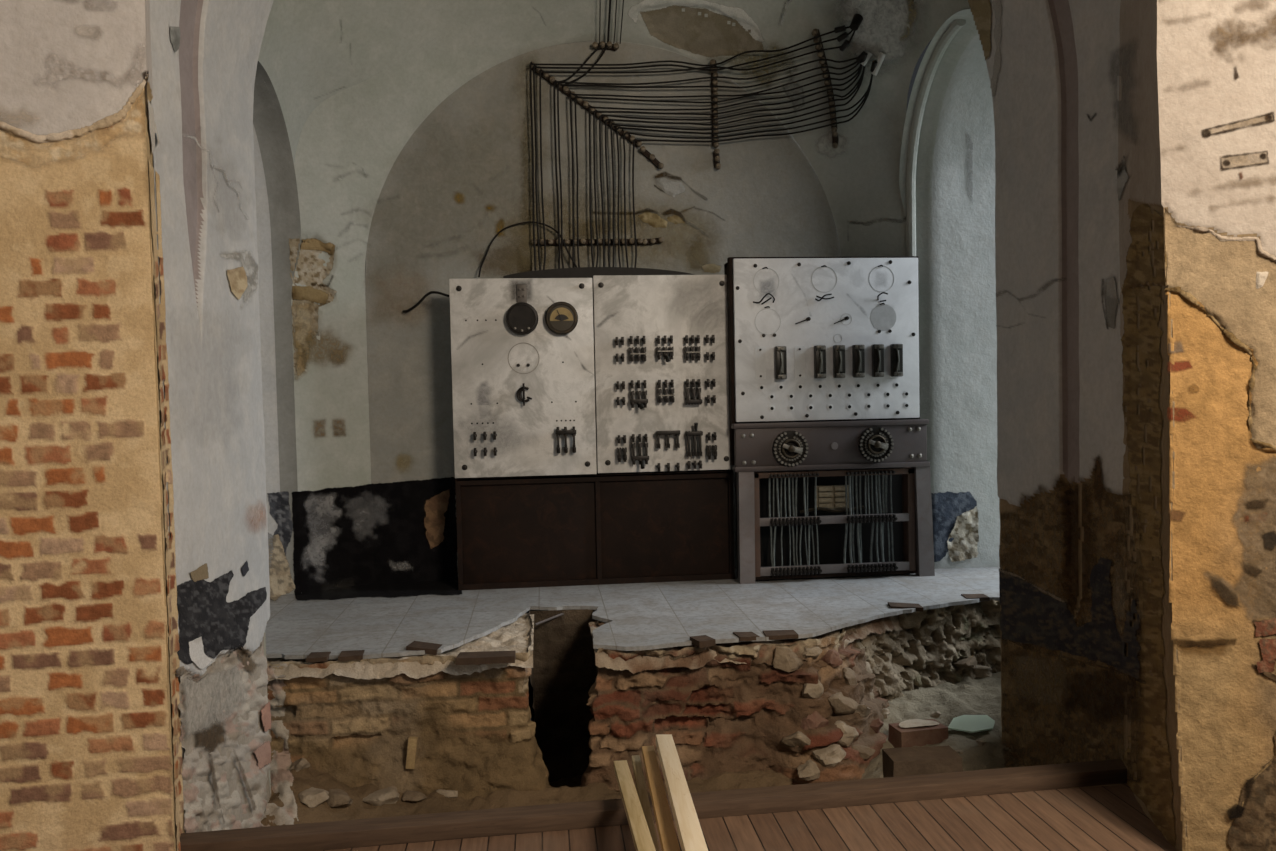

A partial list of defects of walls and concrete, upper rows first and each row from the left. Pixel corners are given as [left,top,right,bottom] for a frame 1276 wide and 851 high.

flaking render [627,0,792,85]
flaking render [968,0,1002,97]
flaking render [0,74,1024,851]
flaking render [961,204,1276,851]